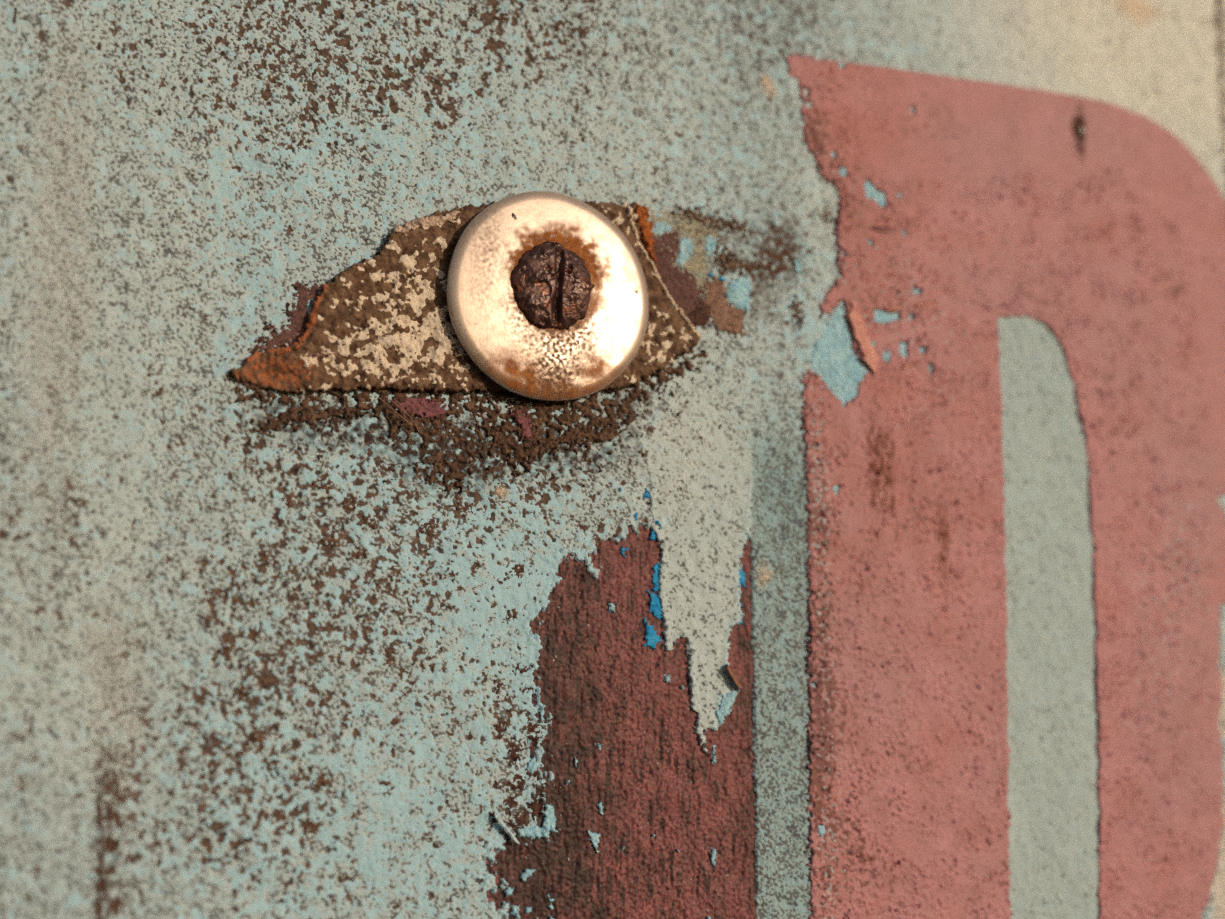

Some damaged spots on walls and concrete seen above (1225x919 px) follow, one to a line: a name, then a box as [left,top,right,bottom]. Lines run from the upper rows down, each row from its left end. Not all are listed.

spalling [863,180,901,207]
corrosion [630,202,658,270]
corrosion [508,225,609,335]
peeling [810,288,937,407]
corrosion [497,356,609,396]
peeling [225,205,810,764]
peeling [212,622,268,661]
peeling [283,769,335,789]
peeling [485,704,558,845]
peeling [265,803,324,839]
peeling [587,830,601,853]
peeling [504,869,536,917]